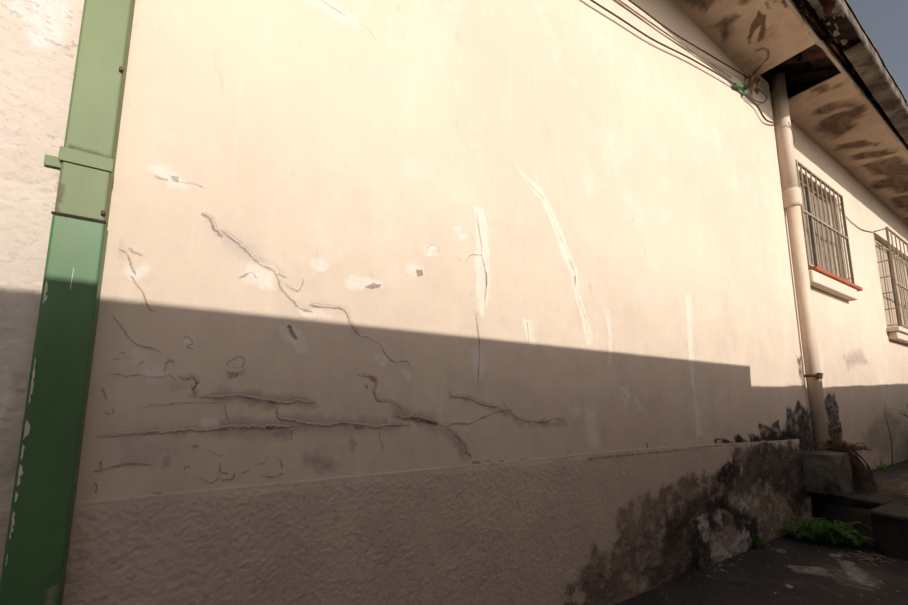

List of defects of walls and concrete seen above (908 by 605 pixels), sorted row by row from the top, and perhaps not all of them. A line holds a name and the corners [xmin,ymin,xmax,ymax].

crack [300,0,361,29]
damp [748,11,766,51]
damp [815,104,908,220]
crack [94,205,569,486]
damp [825,394,843,441]
damp [565,401,816,605]
damp [789,559,883,591]